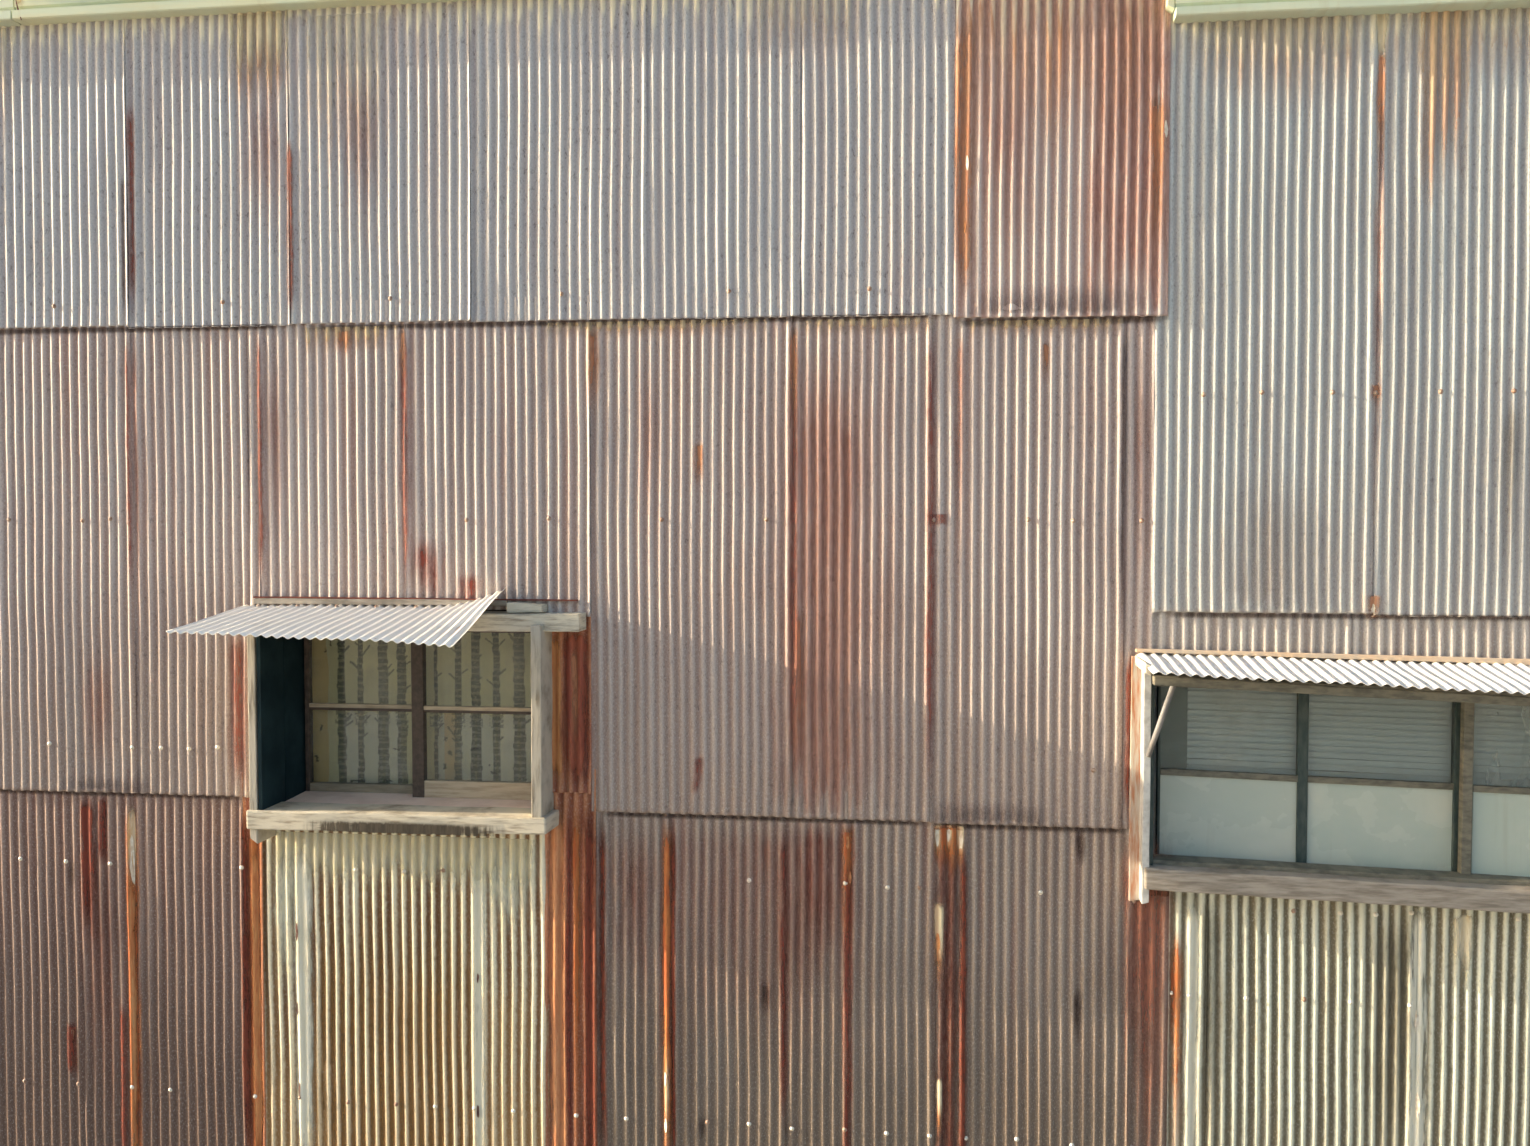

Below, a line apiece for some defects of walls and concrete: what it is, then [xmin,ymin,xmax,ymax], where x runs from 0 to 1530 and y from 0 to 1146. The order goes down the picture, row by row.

corrosion [121,118,134,296]
corrosion [955,26,972,277]
corrosion [1087,5,1168,272]
corrosion [790,334,826,738]
corrosion [552,632,589,779]
corrosion [81,800,107,914]
corrosion [547,816,607,1146]
corrosion [662,836,675,1146]
corrosion [779,845,787,1098]
corrosion [806,831,852,1146]
corrosion [1125,874,1165,1098]